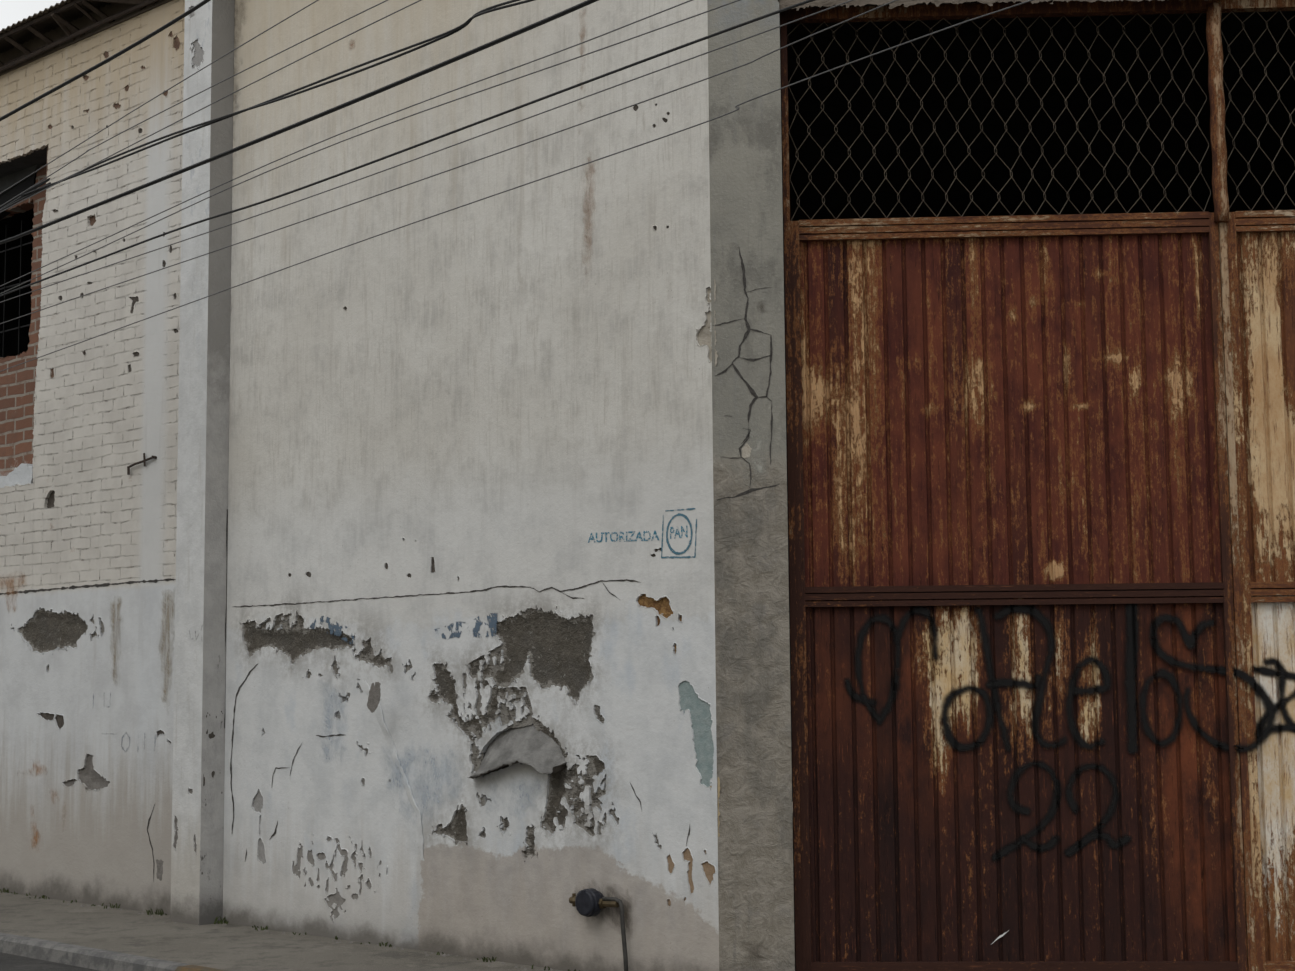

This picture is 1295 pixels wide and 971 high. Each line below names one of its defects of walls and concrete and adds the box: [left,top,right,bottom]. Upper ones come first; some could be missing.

spalling [778,0,1164,11]
peeling [697,279,718,366]
crack [713,248,780,500]
crack [225,509,641,642]
spalling [12,608,104,670]
spalling [244,614,416,719]
spalling [64,754,110,790]
crack [224,664,278,860]
crack [272,734,345,782]
spalling [429,608,619,858]
peeling [293,836,388,921]